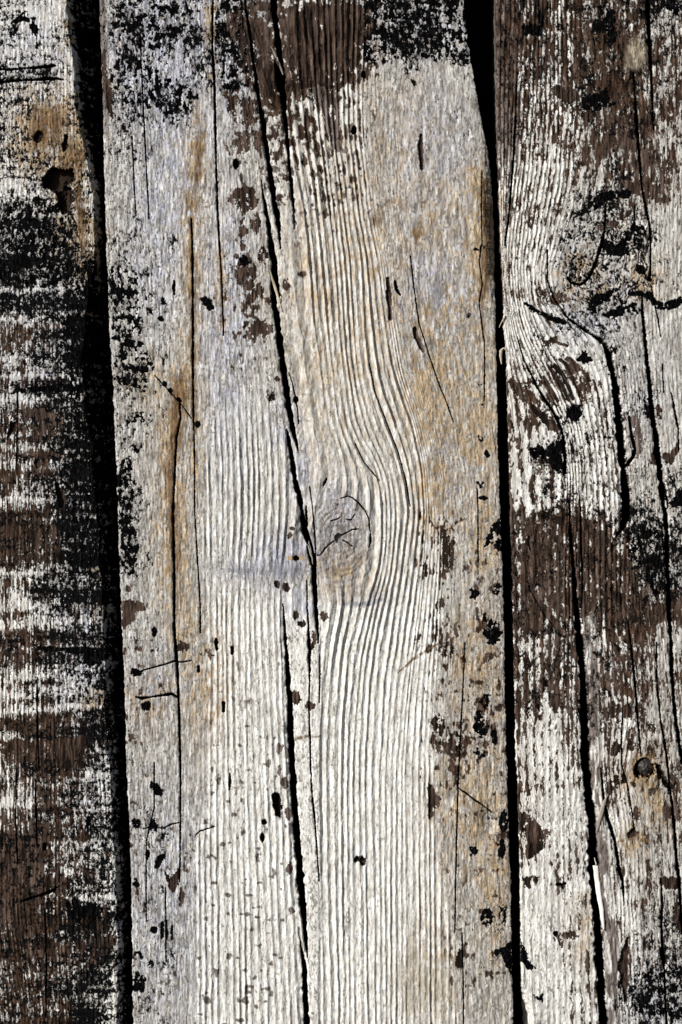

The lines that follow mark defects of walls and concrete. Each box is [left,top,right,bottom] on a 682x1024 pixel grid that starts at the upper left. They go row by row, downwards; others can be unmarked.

peeling [101,0,199,123]
peeling [214,0,470,154]
peeling [552,84,617,113]
peeling [586,180,682,319]
peeling [0,186,143,580]
crack [136,0,224,961]
crack [244,0,372,1024]
peeling [526,516,666,635]
crack [546,0,682,1024]
peeling [37,644,105,668]
peeling [604,700,656,734]
peeling [0,838,117,966]